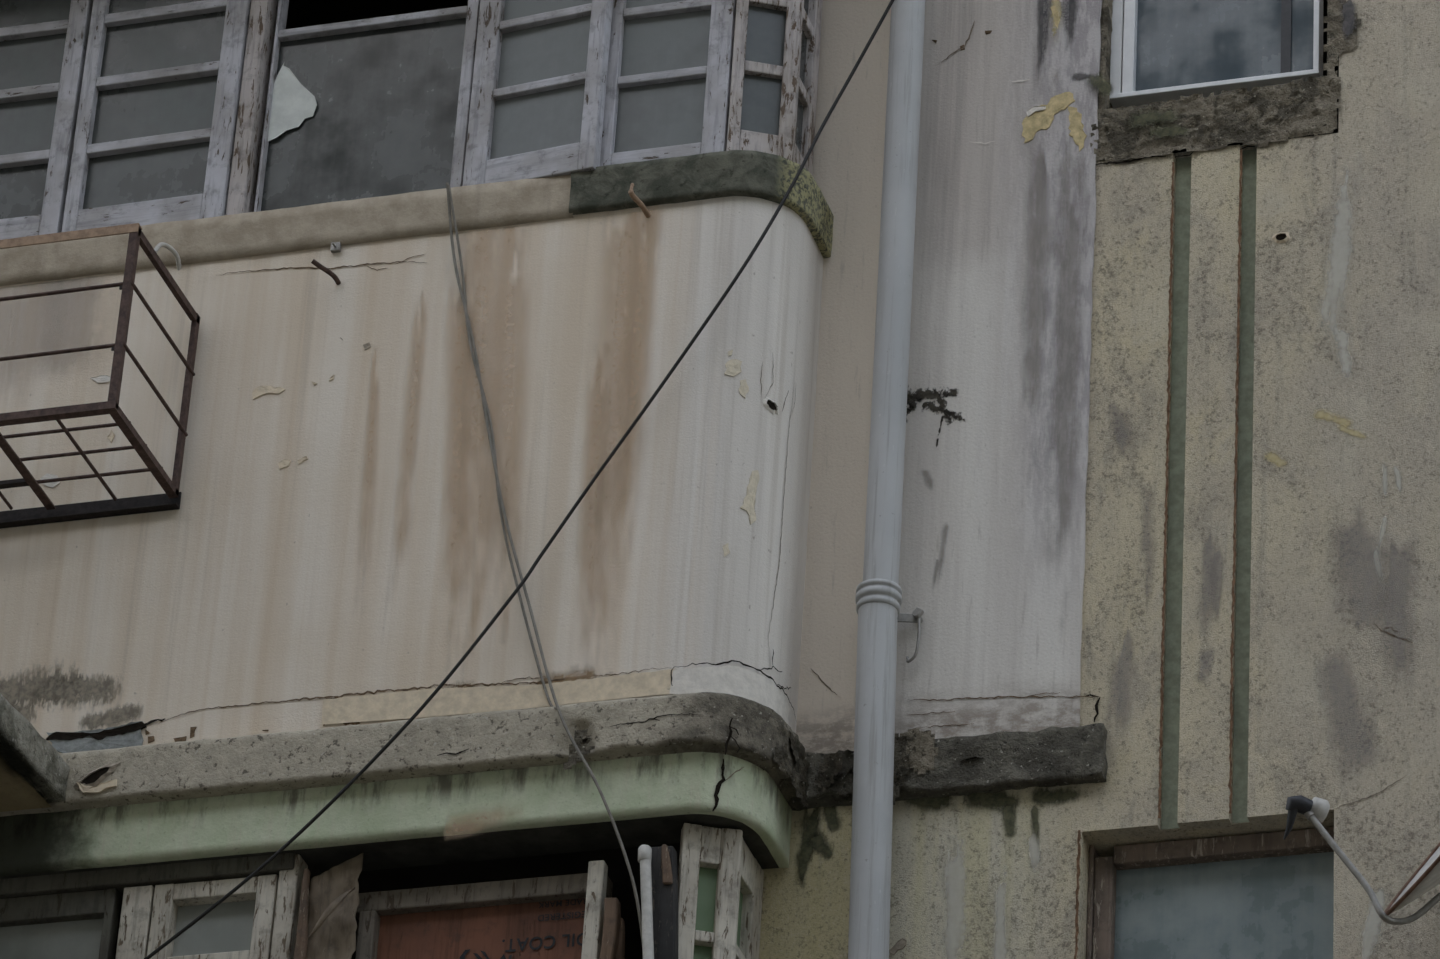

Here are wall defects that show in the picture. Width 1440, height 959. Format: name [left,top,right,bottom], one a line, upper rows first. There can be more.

damp [906,386,965,447]
spalling [1022,0,1361,818]
crack [145,362,837,811]
damp [0,669,141,730]
spalling [893,728,938,805]